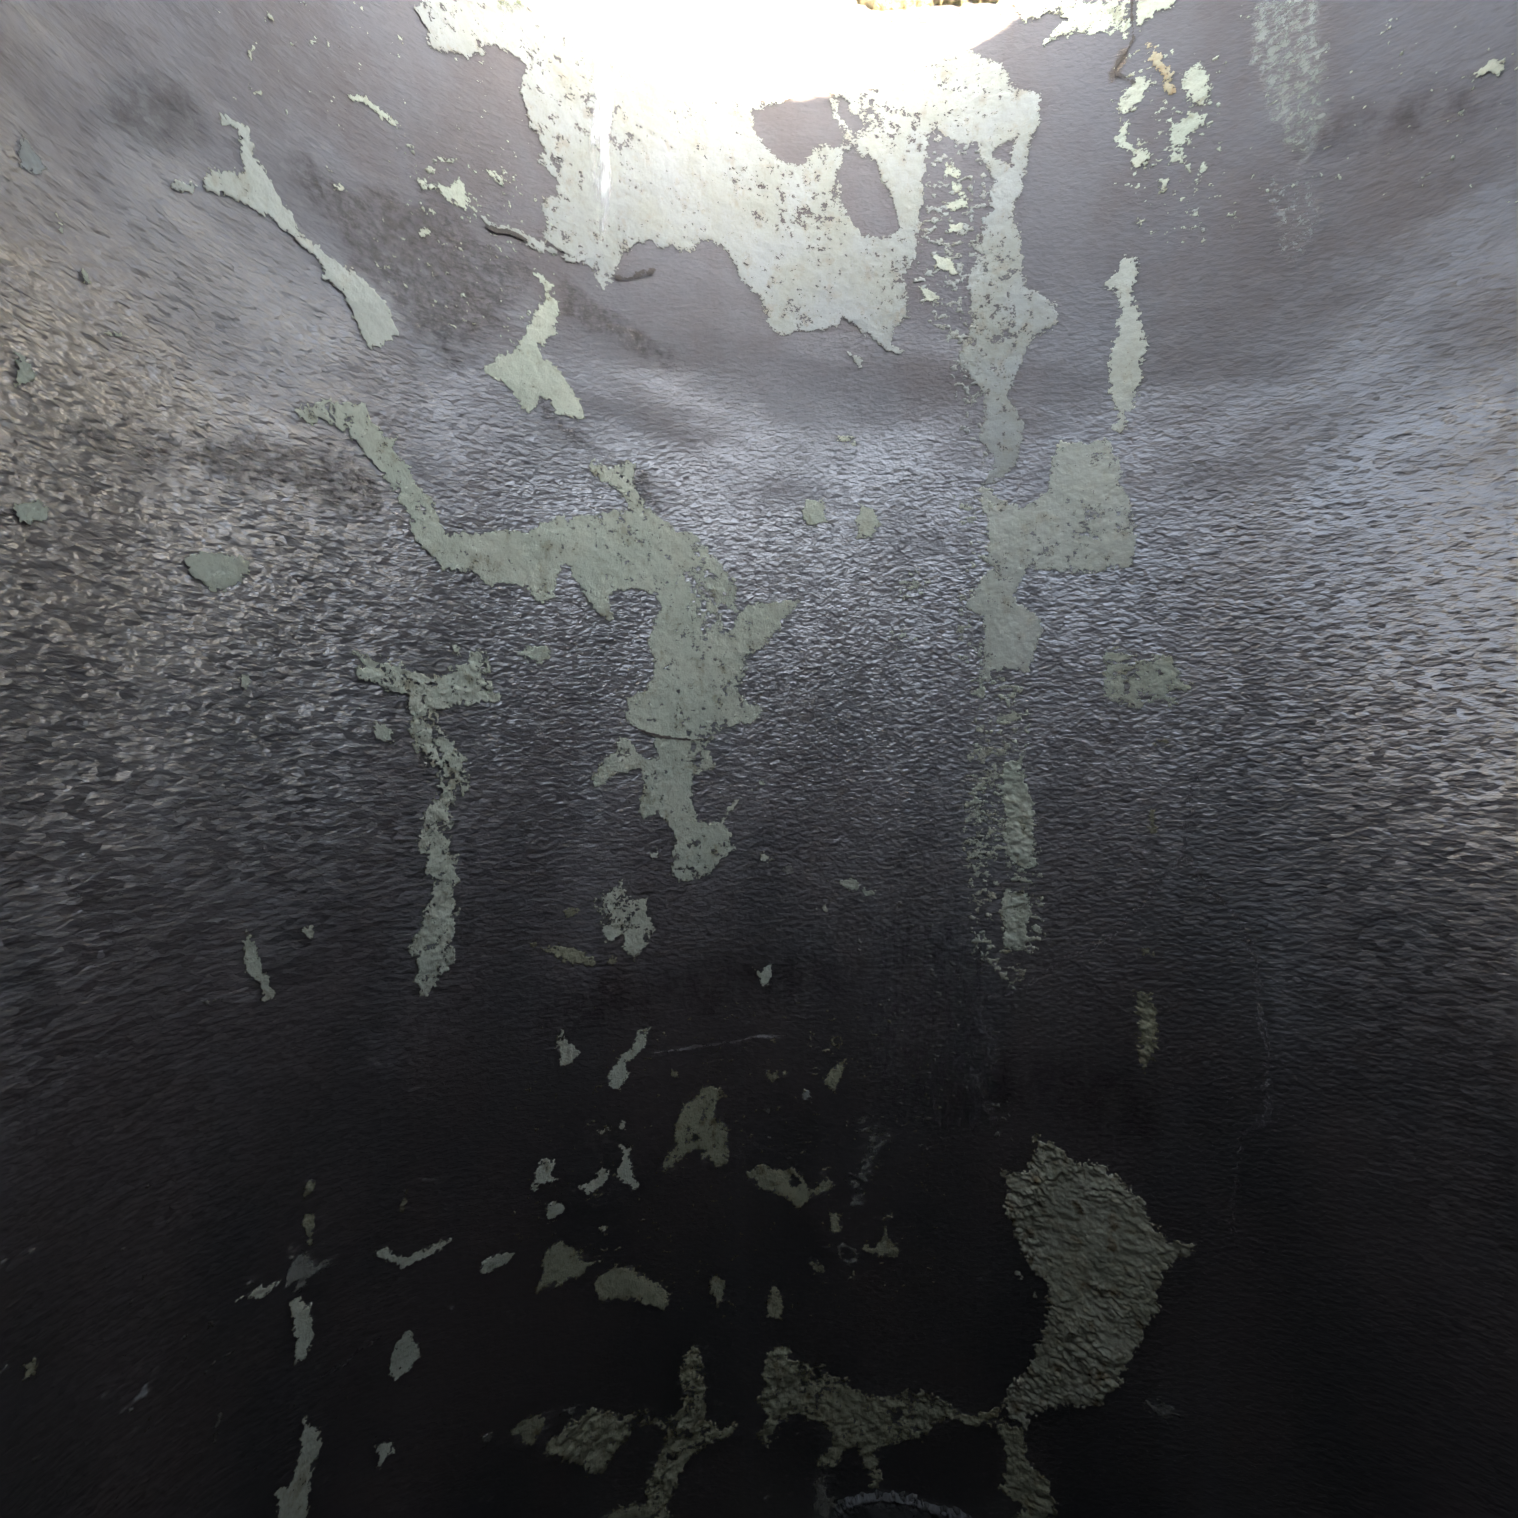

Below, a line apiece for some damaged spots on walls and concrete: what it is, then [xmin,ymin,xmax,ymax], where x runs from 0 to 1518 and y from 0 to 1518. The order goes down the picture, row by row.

peeling [990,0,1240,245]
peeling [170,0,1150,1324]
peeling [1102,643,1193,710]
peeling [1132,988,1160,1074]
peeling [235,1180,335,1366]
peeling [273,1415,323,1518]
peeling [372,1438,395,1470]
peeling [387,1330,422,1381]
peeling [482,1343,738,1518]
spalling [754,1133,1197,1518]